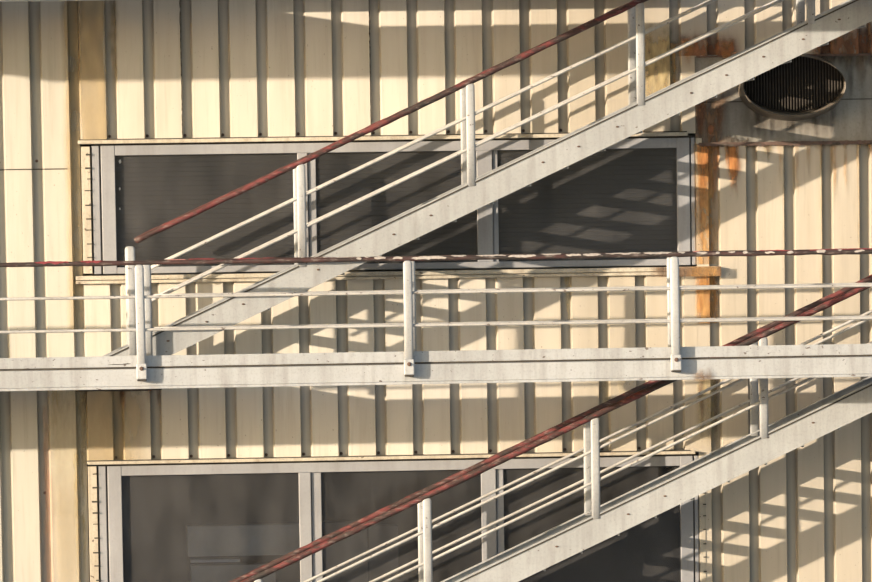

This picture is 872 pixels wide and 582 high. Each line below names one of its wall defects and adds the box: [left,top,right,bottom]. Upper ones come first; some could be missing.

corrosion [683,38,737,56]
corrosion [814,22,872,54]
corrosion [679,99,872,324]